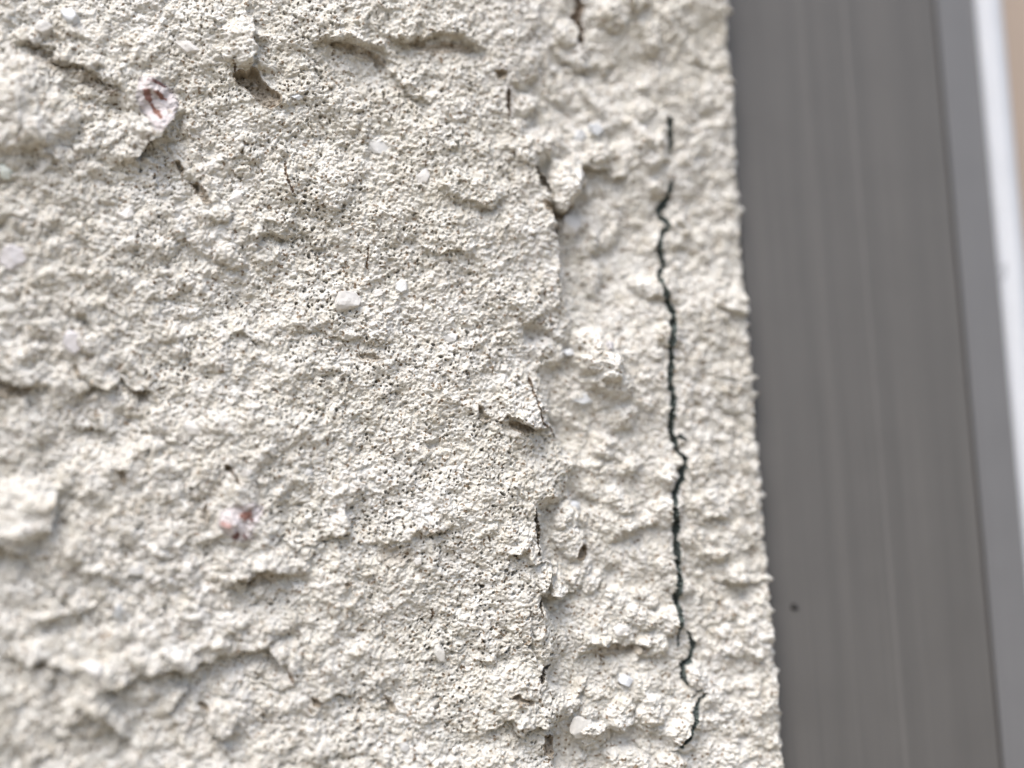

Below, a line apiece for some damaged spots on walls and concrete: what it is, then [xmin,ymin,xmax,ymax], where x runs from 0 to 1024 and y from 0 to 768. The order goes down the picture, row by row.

crack [654,115,708,749]